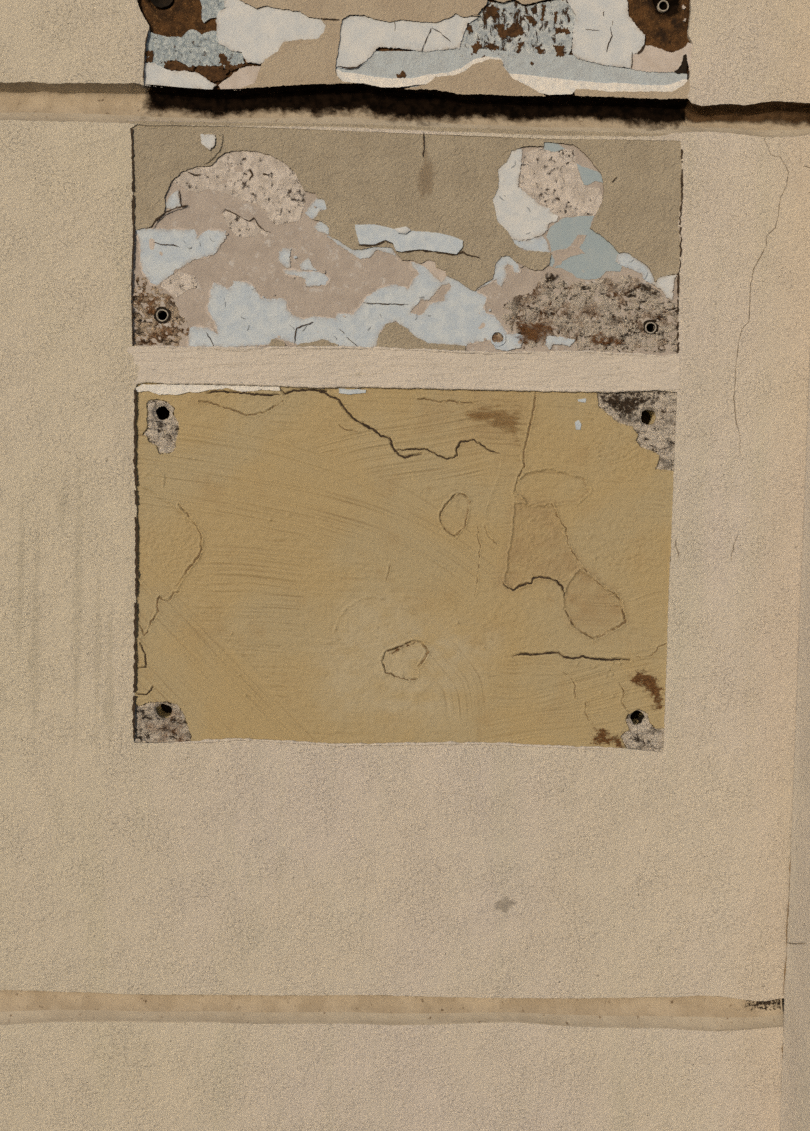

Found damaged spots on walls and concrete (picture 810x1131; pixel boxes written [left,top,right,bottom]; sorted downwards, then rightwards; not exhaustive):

peeling [138,0,692,100]
peeling [125,120,684,356]
crack [733,137,810,441]
crack [203,388,536,477]
crack [138,506,202,695]
peeling [132,383,676,752]
crack [382,642,429,680]
crack [440,494,666,720]
corrosion [590,727,622,748]
corrosion [630,670,664,710]